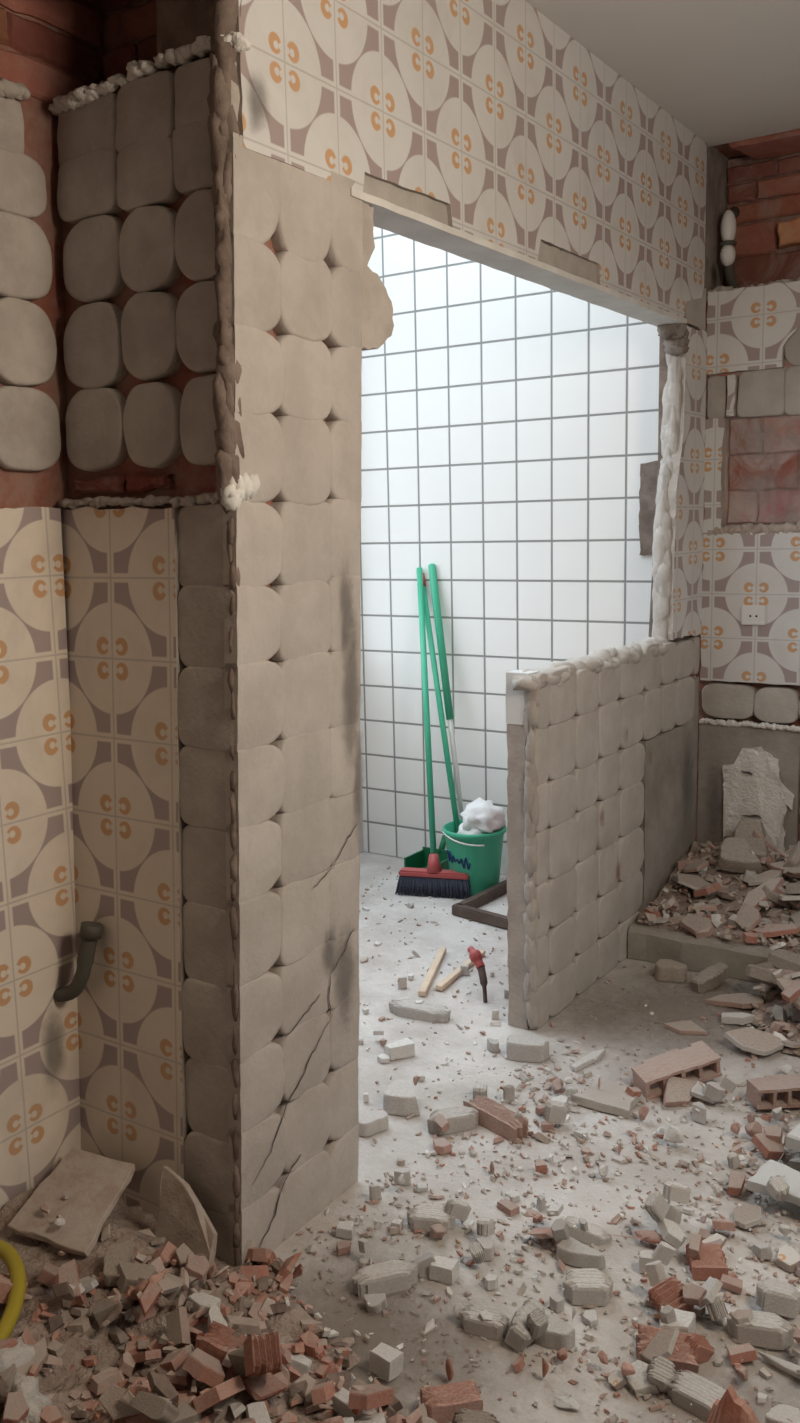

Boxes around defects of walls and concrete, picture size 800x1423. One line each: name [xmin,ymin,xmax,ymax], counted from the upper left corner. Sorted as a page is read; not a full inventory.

peeling [0,0,448,1266]
peeling [512,129,800,1031]